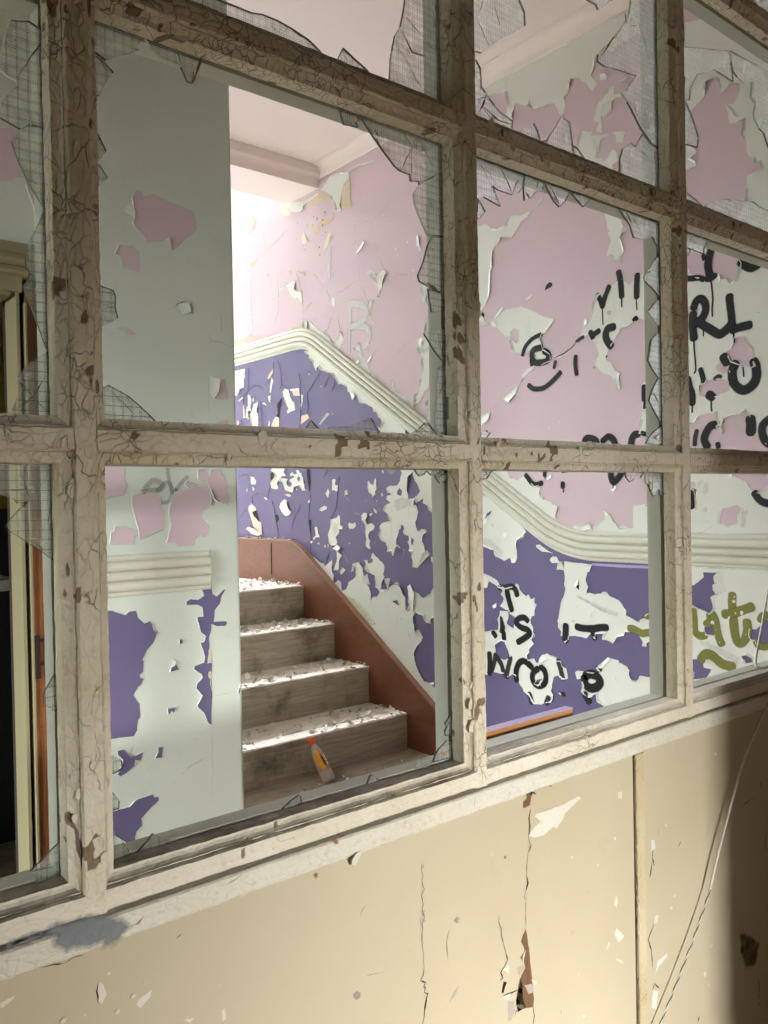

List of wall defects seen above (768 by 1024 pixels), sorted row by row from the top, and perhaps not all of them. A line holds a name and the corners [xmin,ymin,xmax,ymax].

peeling [682,19,768,232]
peeling [304,351,406,434]
peeling [473,198,644,425]
peeling [678,242,768,445]
peeling [108,610,164,777]
peeling [186,586,228,725]
peeling [313,469,435,702]
peeling [483,573,650,706]
peeling [536,545,649,647]
peeling [681,474,768,543]
crack [409,864,449,1024]
crack [498,809,537,1023]